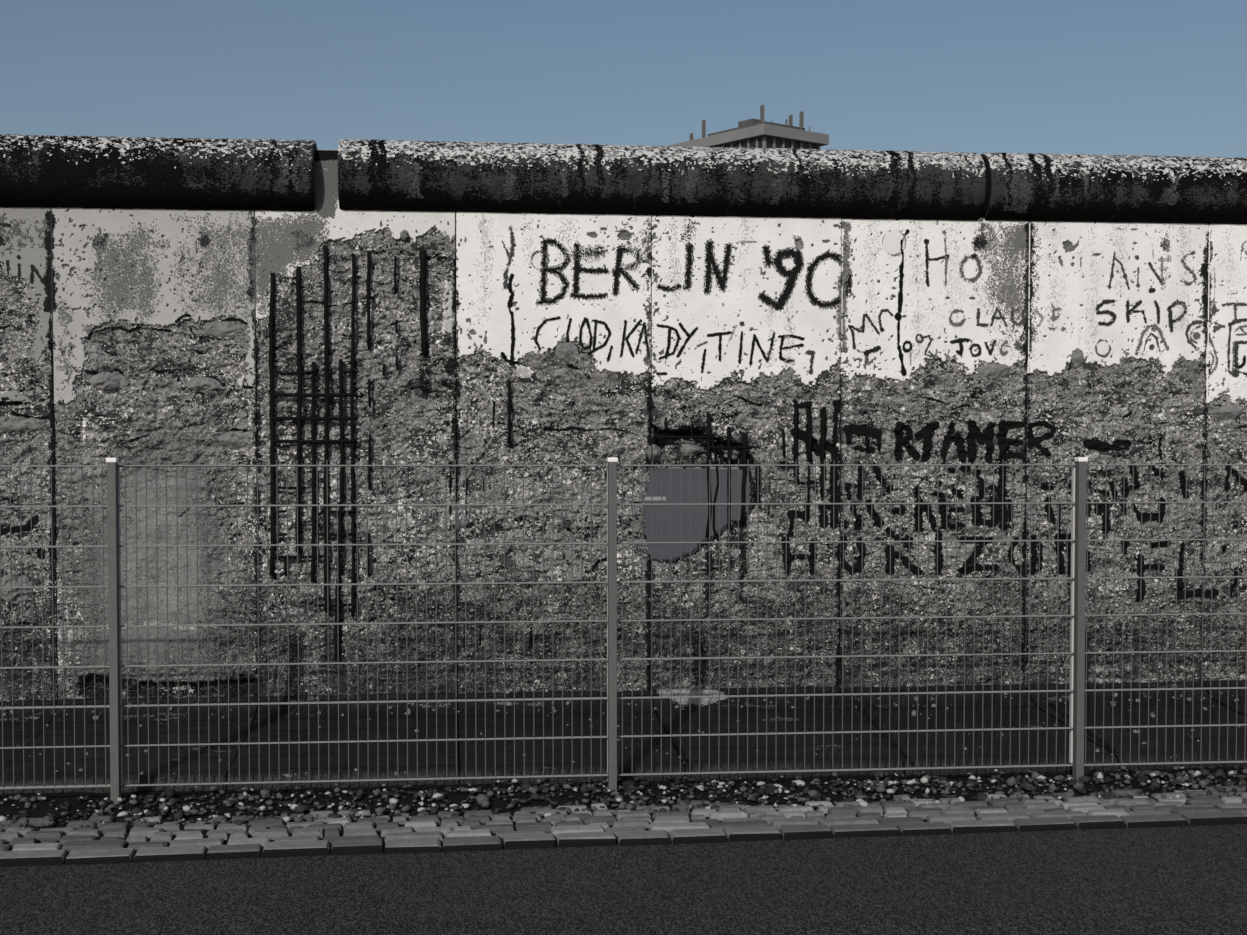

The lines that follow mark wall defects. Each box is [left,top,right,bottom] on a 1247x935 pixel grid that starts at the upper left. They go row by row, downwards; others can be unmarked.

spalling [0,209,1247,703]